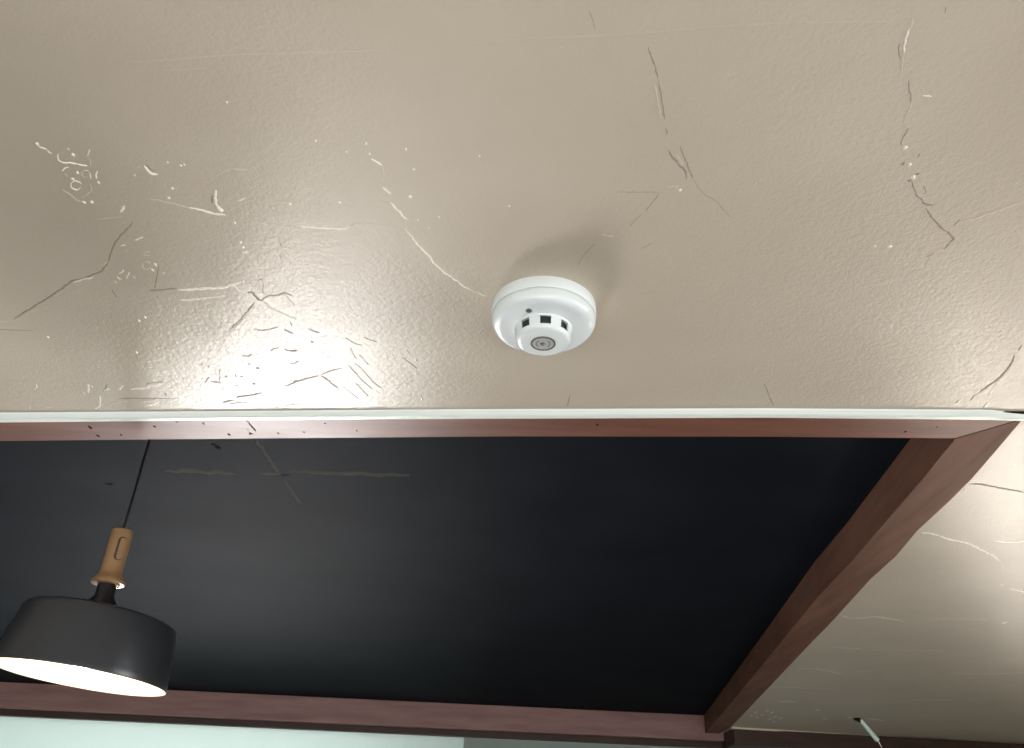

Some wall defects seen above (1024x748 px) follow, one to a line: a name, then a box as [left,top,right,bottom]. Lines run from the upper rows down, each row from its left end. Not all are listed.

crack [13,222,133,321]
crack [149,265,296,330]
crack [345,142,488,297]
crack [578,47,734,265]
crack [898,17,955,258]
crack [956,345,1022,408]